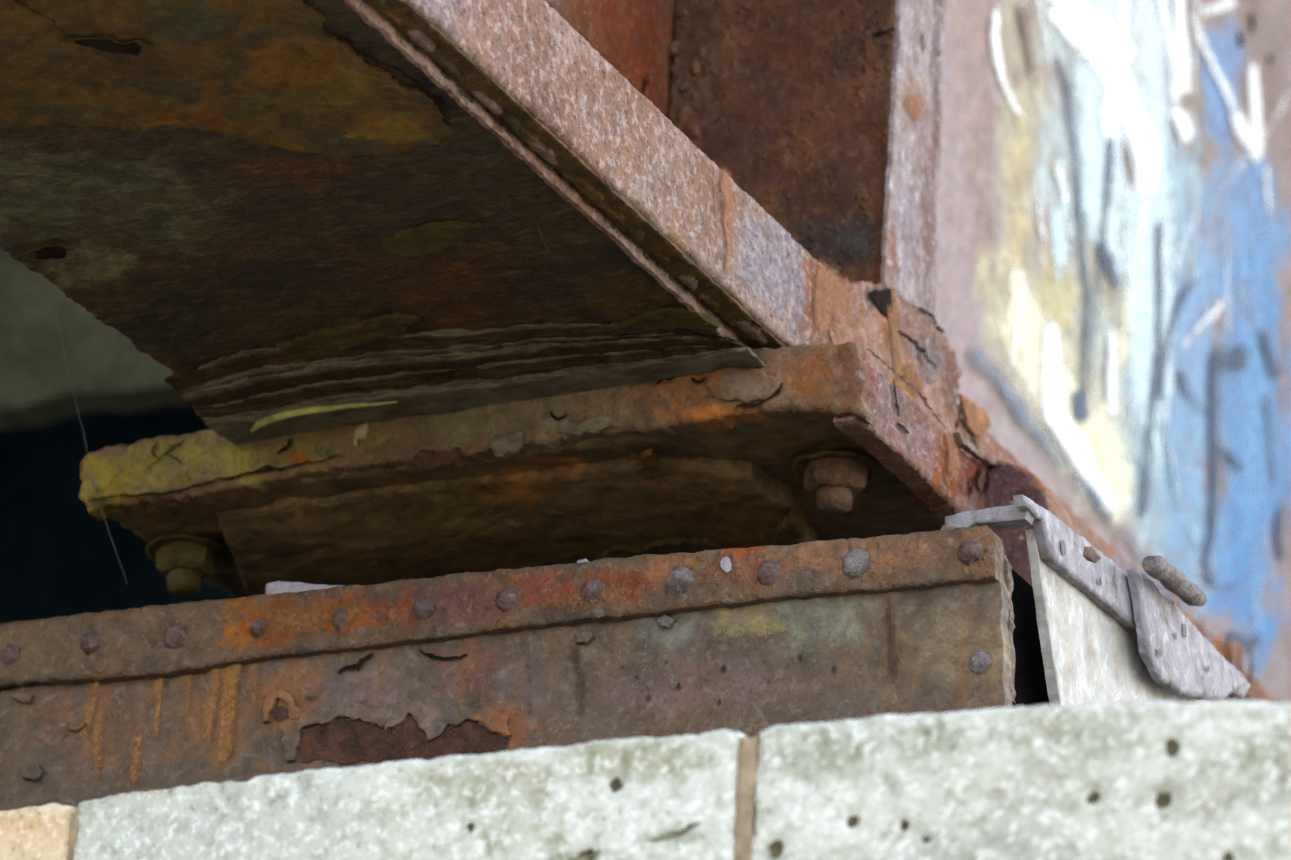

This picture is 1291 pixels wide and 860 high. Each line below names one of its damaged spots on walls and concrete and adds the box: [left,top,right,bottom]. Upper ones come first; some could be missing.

hole [60,36,154,56]
crack [872,28,924,51]
rust [815,263,923,393]
rust [164,307,781,446]
rust [489,430,524,459]
crack [867,307,989,496]
rust [946,393,998,483]
rust [577,536,716,563]
rust [771,493,806,546]
rust [656,614,677,629]
rust [129,678,164,781]
rust [183,663,512,764]